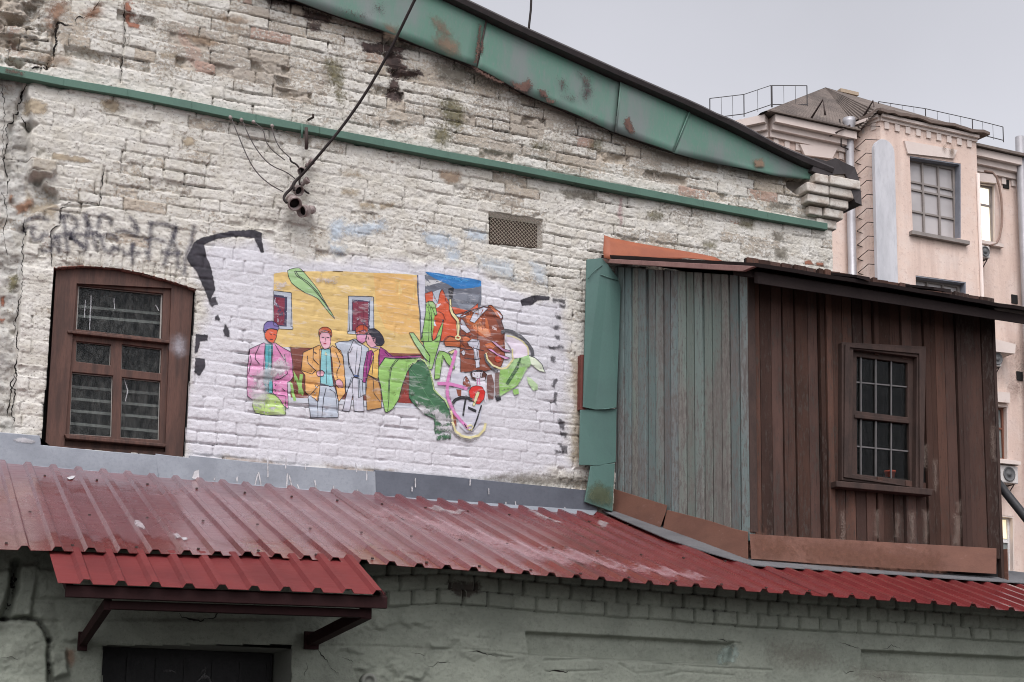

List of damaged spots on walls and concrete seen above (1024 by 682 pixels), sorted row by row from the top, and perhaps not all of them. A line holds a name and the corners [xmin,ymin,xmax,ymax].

spalling [125,2,140,29]
water stain [361,42,424,102]
corrosion [474,24,595,104]
crack [1,2,105,422]